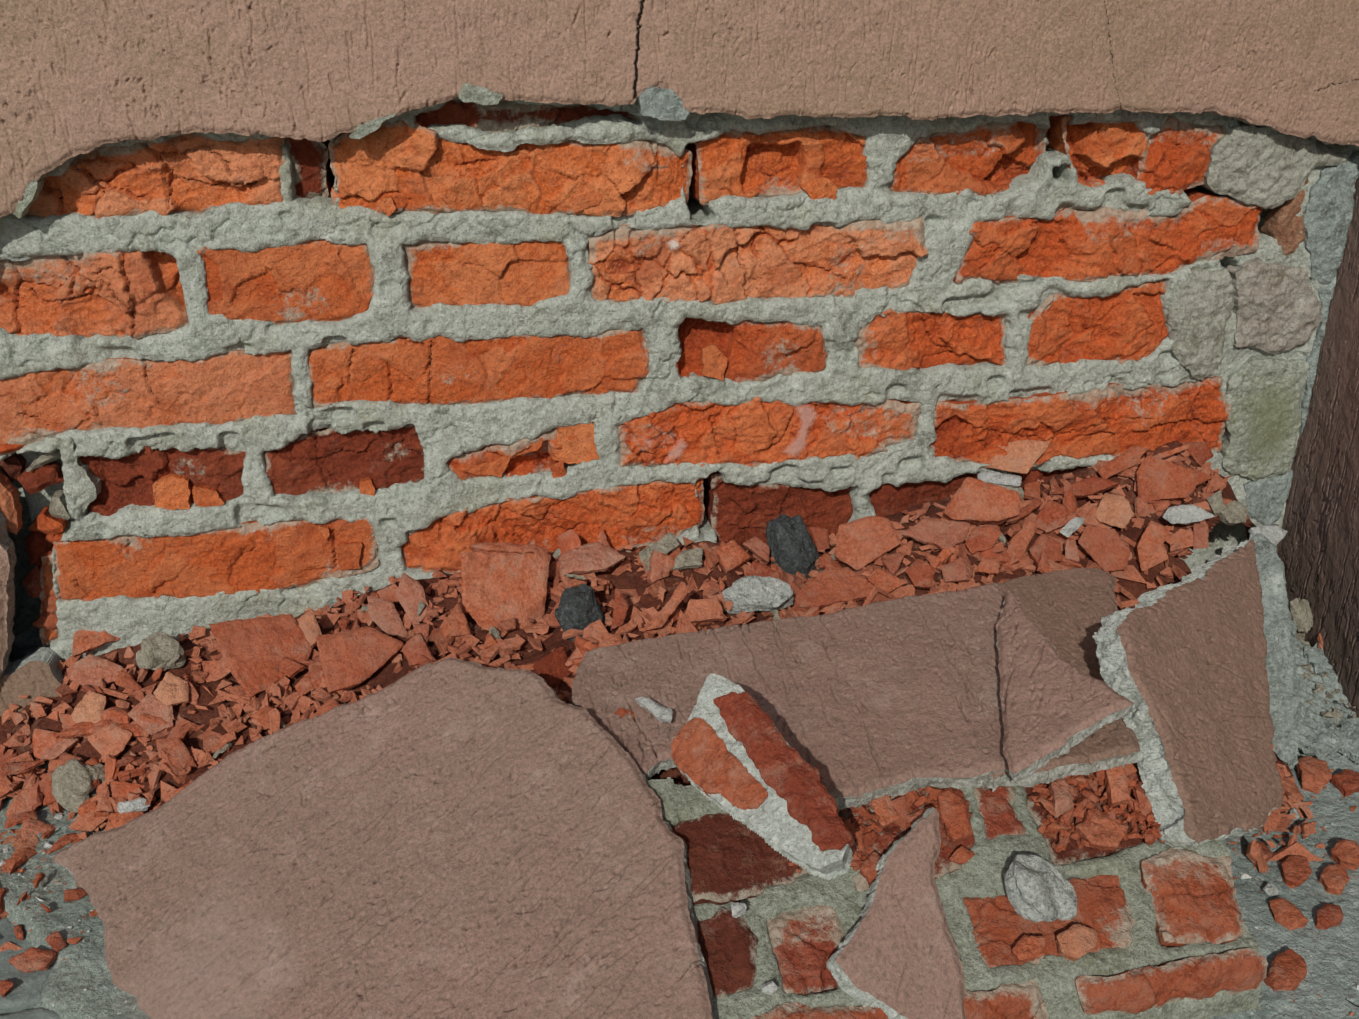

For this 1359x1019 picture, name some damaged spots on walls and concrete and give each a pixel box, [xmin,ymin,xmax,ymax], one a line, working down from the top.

crack [634,0,645,97]
spalling [0,83,1359,832]
spalling [860,851,881,886]
spalling [938,788,975,865]
spalling [1049,765,1130,851]
spalling [1269,839,1359,931]
spalling [1011,924,1097,963]